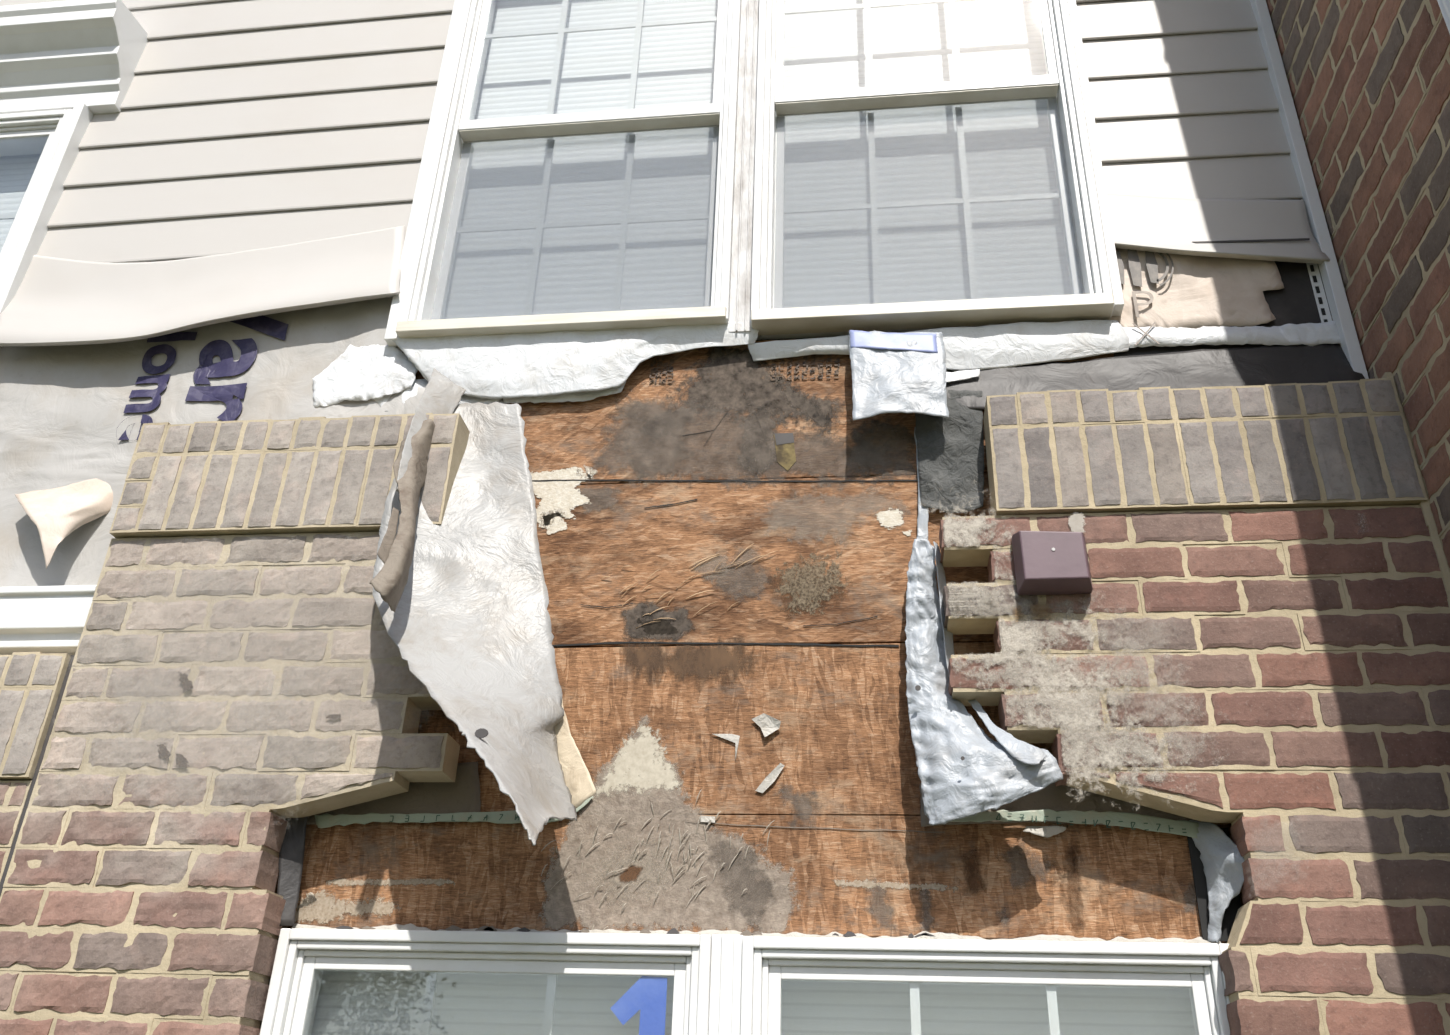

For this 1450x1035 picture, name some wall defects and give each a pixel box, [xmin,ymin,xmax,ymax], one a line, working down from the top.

damp [579,346,915,513]
peeling [543,512,568,535]
peeling [601,543,776,641]
damp [710,549,842,618]
spalling [292,789,1221,944]